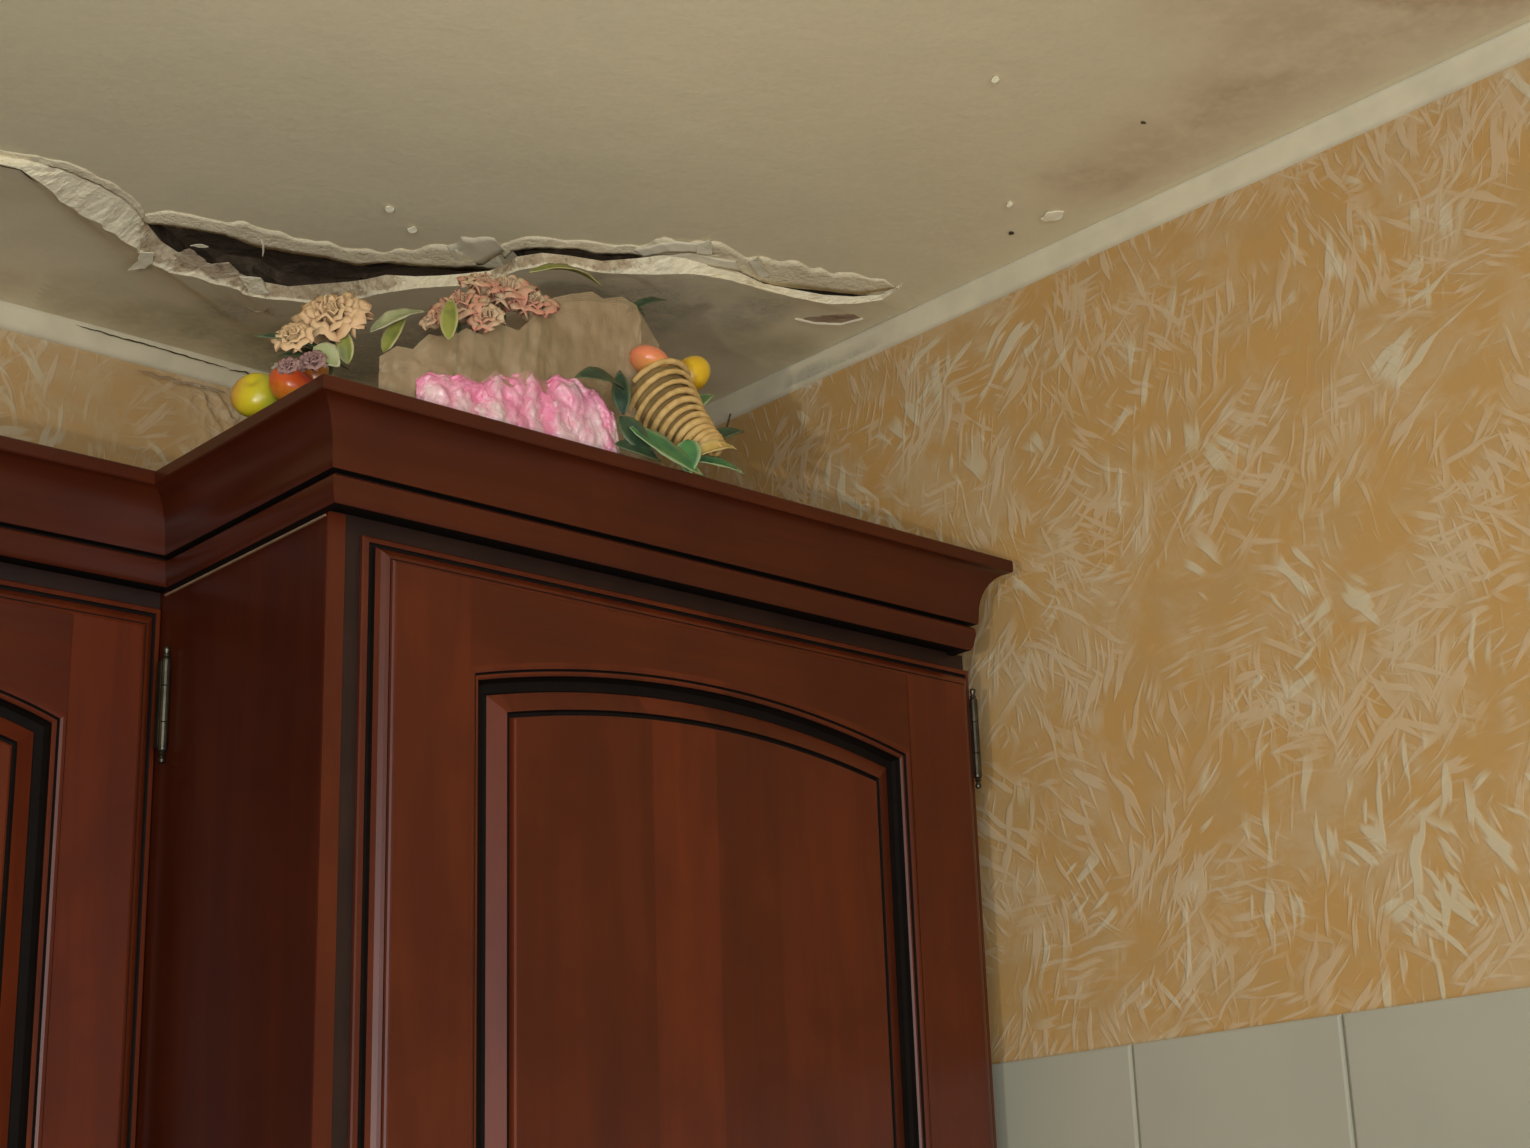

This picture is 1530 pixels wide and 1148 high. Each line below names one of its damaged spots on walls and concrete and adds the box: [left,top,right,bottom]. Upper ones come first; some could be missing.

spalling [0,150,896,295]
spalling [794,314,863,325]